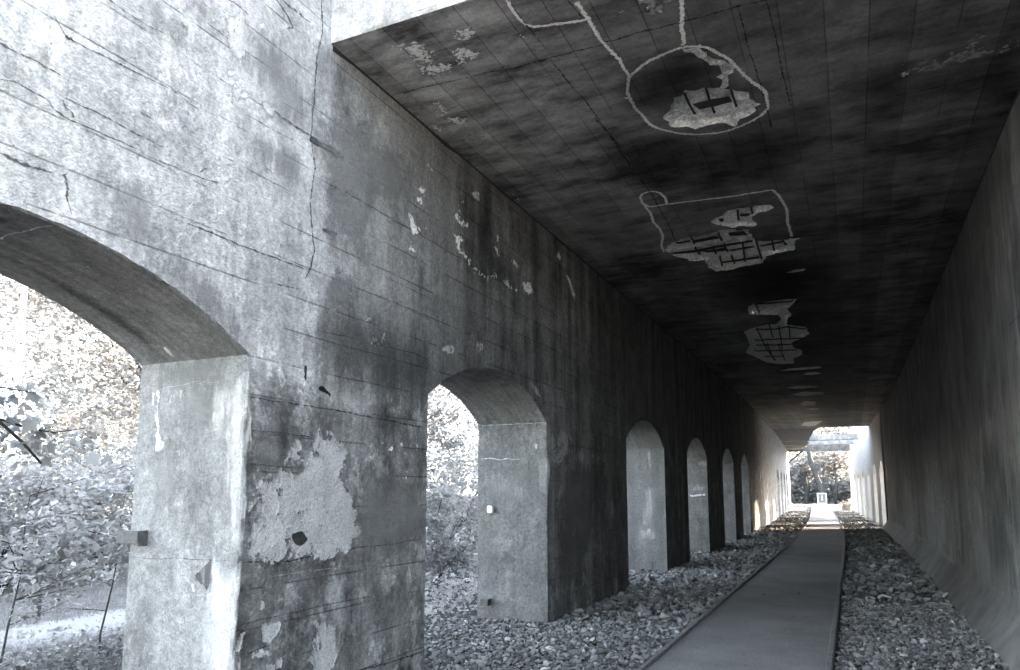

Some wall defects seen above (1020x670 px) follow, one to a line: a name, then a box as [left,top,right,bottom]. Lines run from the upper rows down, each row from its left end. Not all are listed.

crack [110,0,262,63]
peeling [368,26,479,76]
peeling [638,0,674,15]
spalling [663,48,760,129]
crack [1,153,72,214]
crack [187,0,791,428]
peeling [453,191,534,295]
spalling [665,205,800,272]
spalling [744,299,825,426]
peeling [246,427,361,570]
peeling [252,583,283,670]
peeling [307,619,343,670]